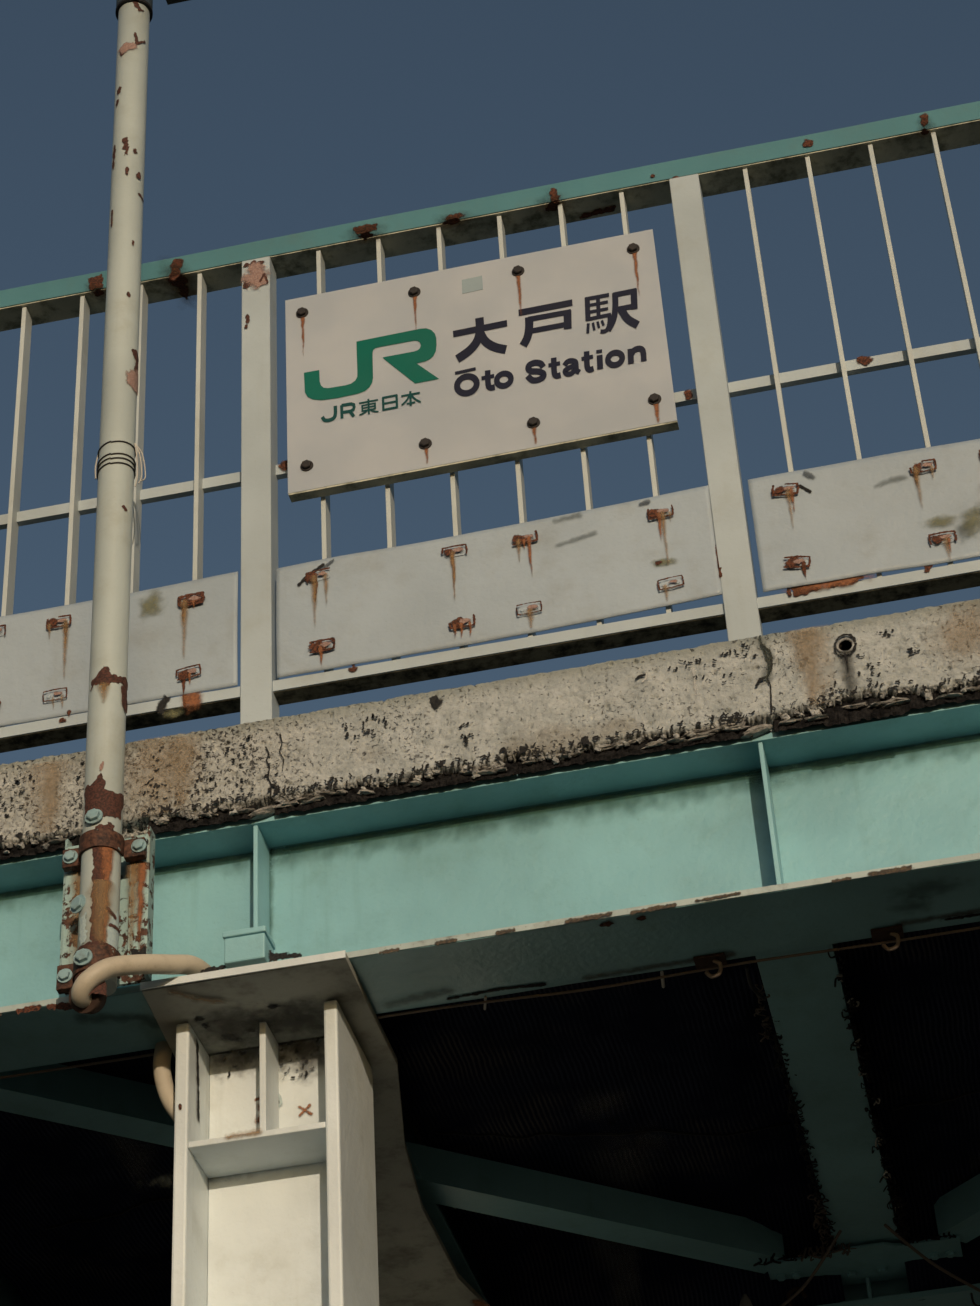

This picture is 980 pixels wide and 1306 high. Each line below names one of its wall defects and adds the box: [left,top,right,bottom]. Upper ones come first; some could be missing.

rust [771,483,799,511]
rust [512,530,538,569]
rust [647,505,674,551]
rust [928,530,957,552]
rust [783,555,867,596]
rust [46,614,72,664]
rust [177,591,205,638]
rust [448,614,476,635]
rust [175,664,201,708]
crack [755,635,773,713]
spalling [141,654,980,834]
peeling [0,761,124,951]